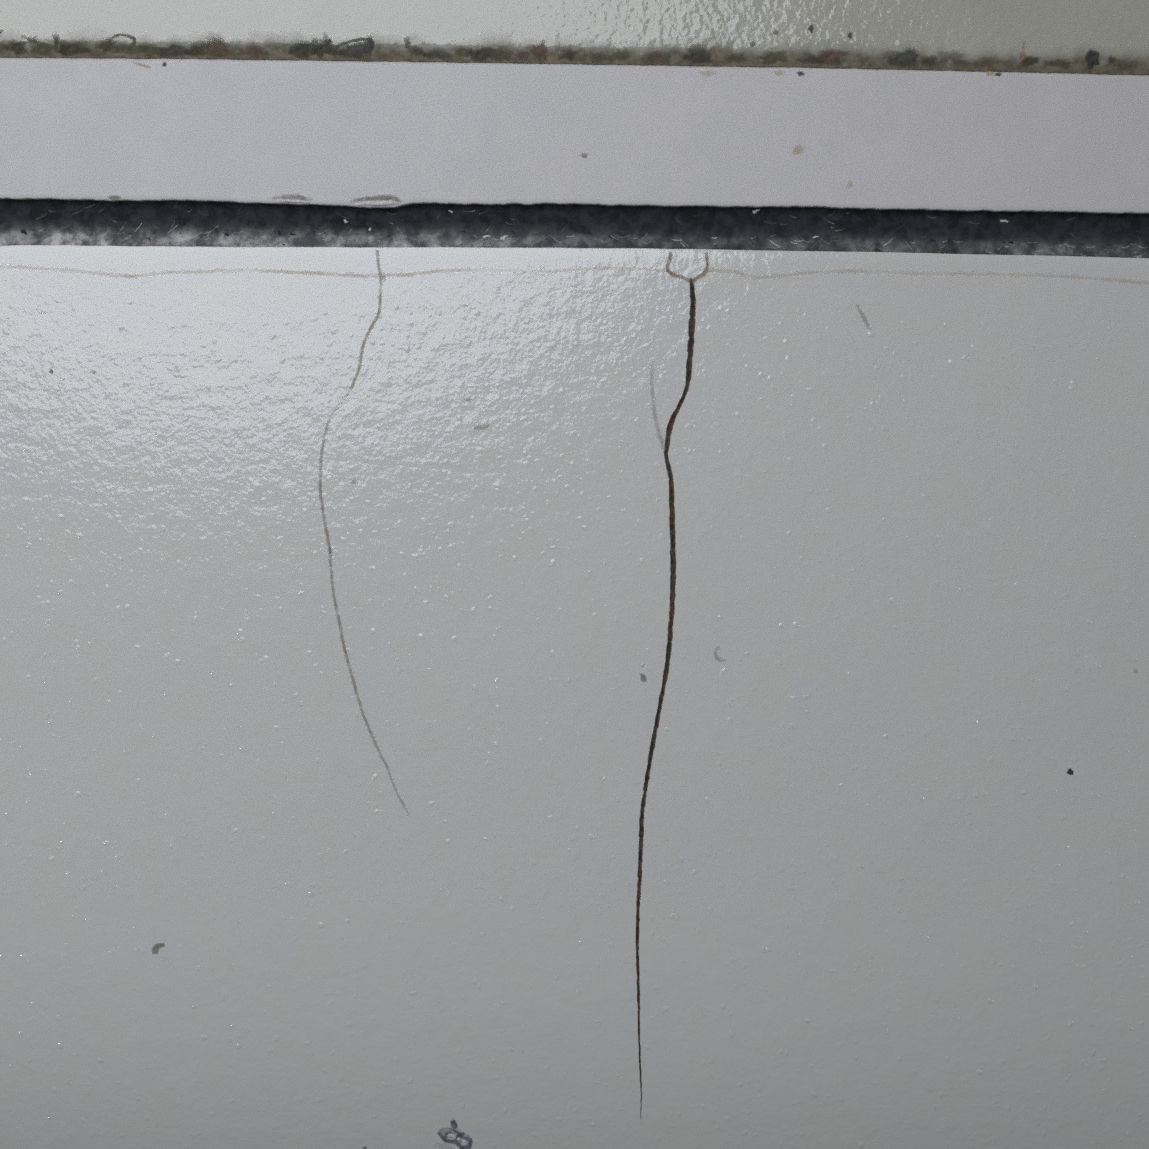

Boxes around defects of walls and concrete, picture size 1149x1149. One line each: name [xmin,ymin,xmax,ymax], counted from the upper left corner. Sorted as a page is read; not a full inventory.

crack [636,252,709,1101]